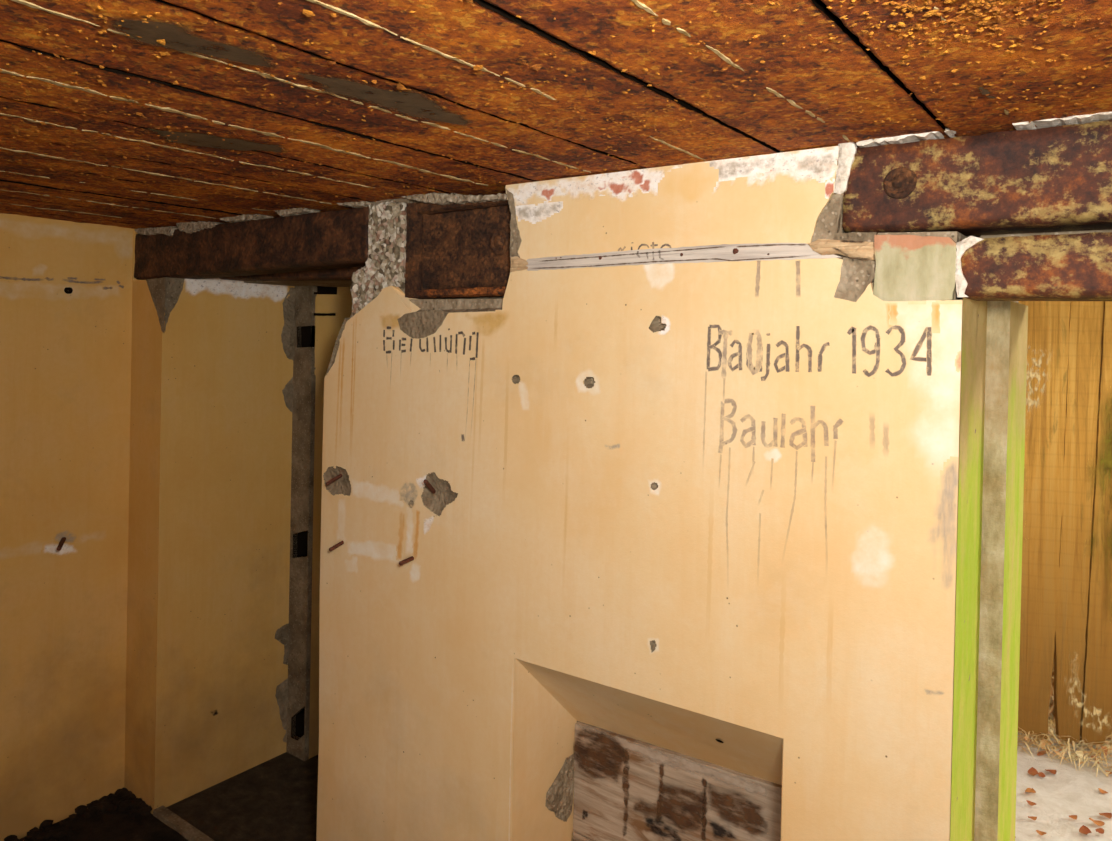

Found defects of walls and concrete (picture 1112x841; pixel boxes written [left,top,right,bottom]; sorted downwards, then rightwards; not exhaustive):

corrosion [0,28,323,209]
corrosion [78,0,787,198]
corrosion [825,84,917,142]
corrosion [782,0,1112,122]
peeling [506,146,878,266]
spalling [326,201,407,375]
spalling [282,377,294,413]
spalling [323,466,351,496]
spalling [421,472,458,516]
spalling [275,623,289,743]